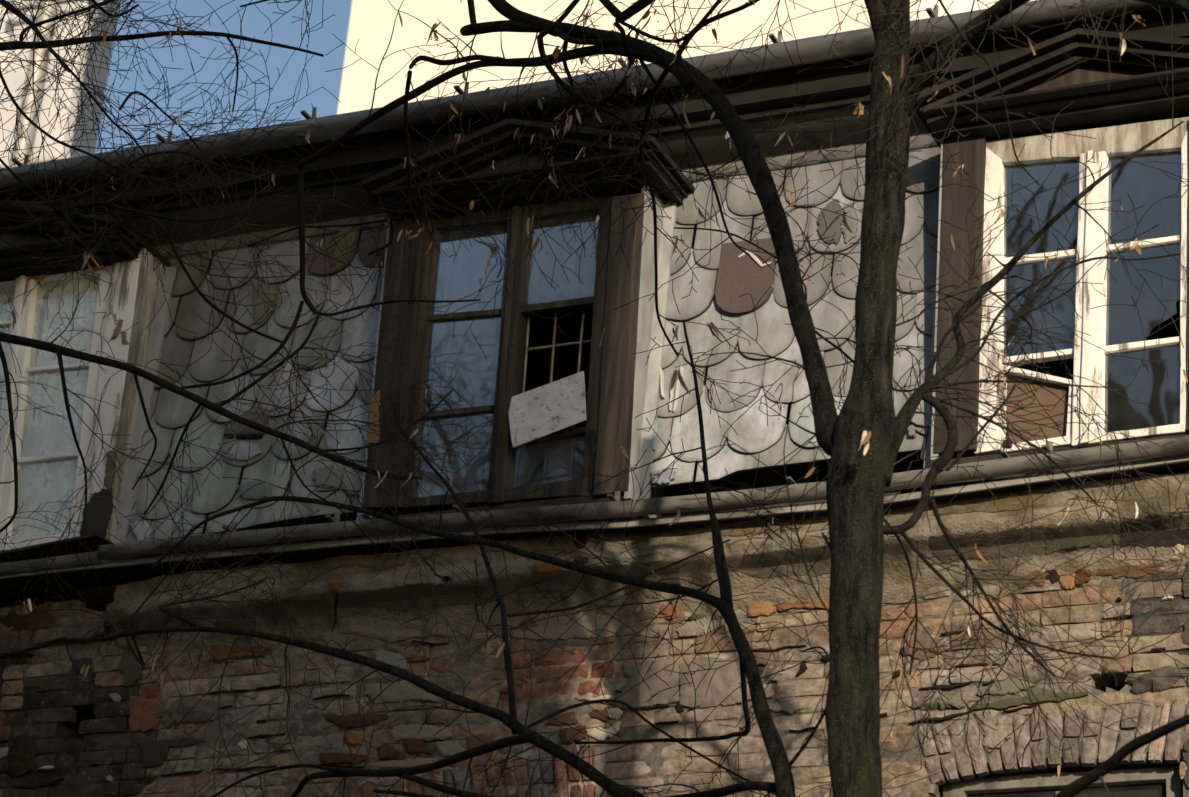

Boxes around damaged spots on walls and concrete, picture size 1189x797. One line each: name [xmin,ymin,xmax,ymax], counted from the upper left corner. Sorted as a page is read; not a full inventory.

spalling [1014,569,1092,590]
spalling [1099,680,1125,692]
flaking render [129,695,163,732]
spalling [324,713,389,729]
spalling [547,708,609,743]
spalling [319,739,436,764]